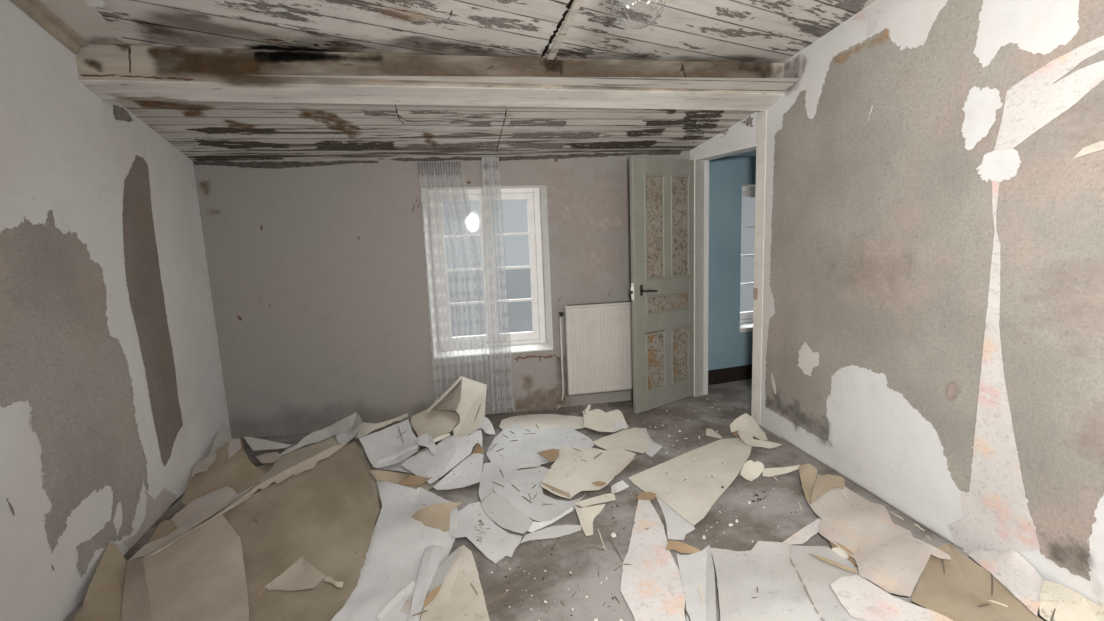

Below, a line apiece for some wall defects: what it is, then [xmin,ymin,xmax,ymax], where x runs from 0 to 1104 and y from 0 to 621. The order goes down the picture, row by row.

peeling [379,0,437,12]
water stain [152,42,771,90]
peeling [467,16,541,32]
crack [541,0,574,87]
peeling [598,3,661,24]
peeling [686,0,802,39]
peeling [113,105,133,122]
peeling [185,127,290,161]
peeling [315,109,728,162]
peeling [122,155,183,466]
peeling [765,0,1104,581]
peeling [0,210,149,578]